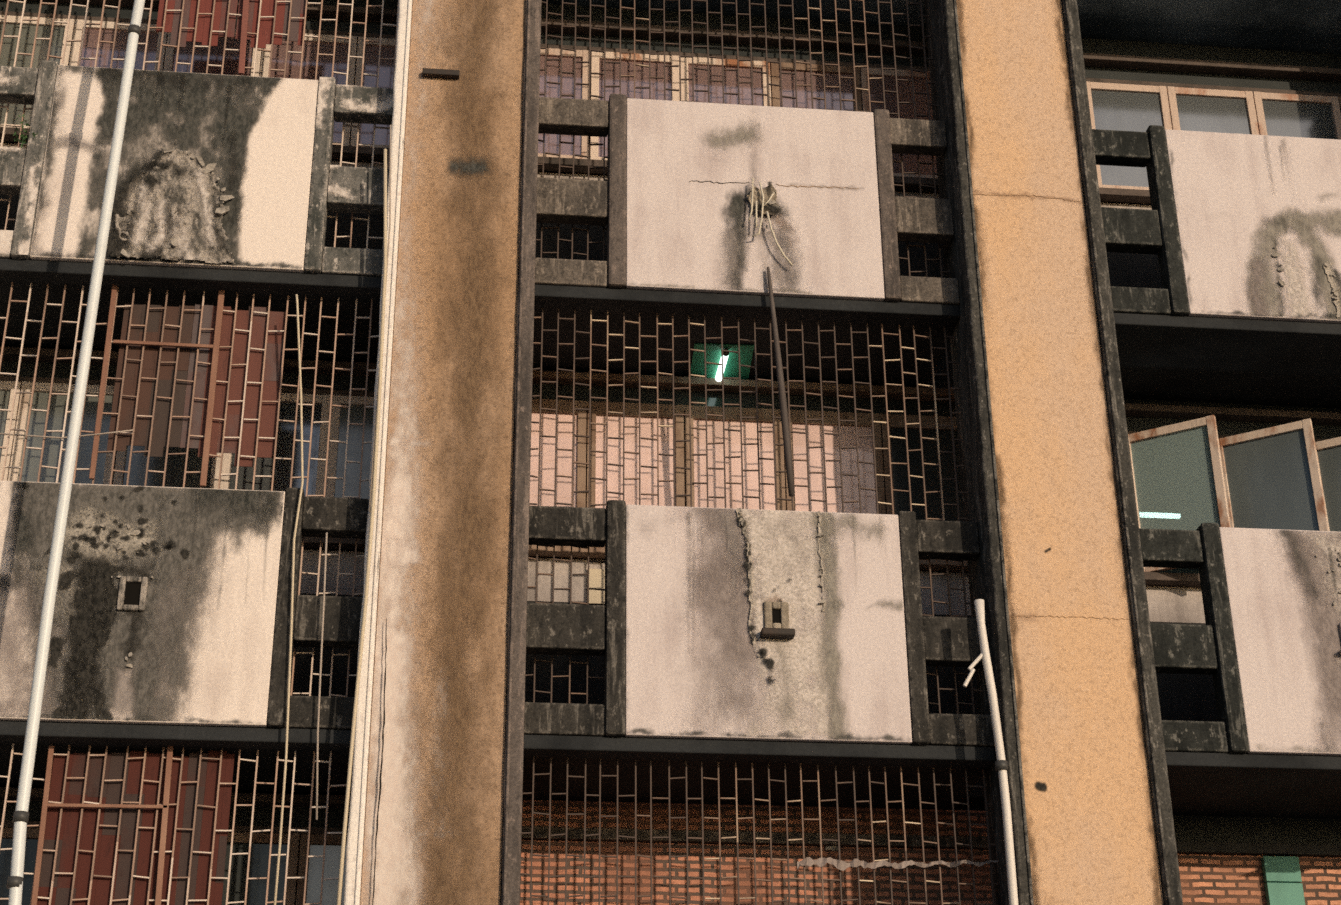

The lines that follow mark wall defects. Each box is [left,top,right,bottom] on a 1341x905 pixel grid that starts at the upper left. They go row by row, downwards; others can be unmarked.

water stain [33,65,285,266]
water stain [710,127,755,146]
water stain [725,188,797,289]
spalling [747,178,793,266]
crack [689,180,859,189]
water stain [1248,209,1341,319]
peeling [44,486,189,611]
water stain [0,482,283,721]
water stain [365,301,422,905]
water stain [695,507,758,715]
water stain [814,512,880,739]
water stain [1283,530,1341,744]